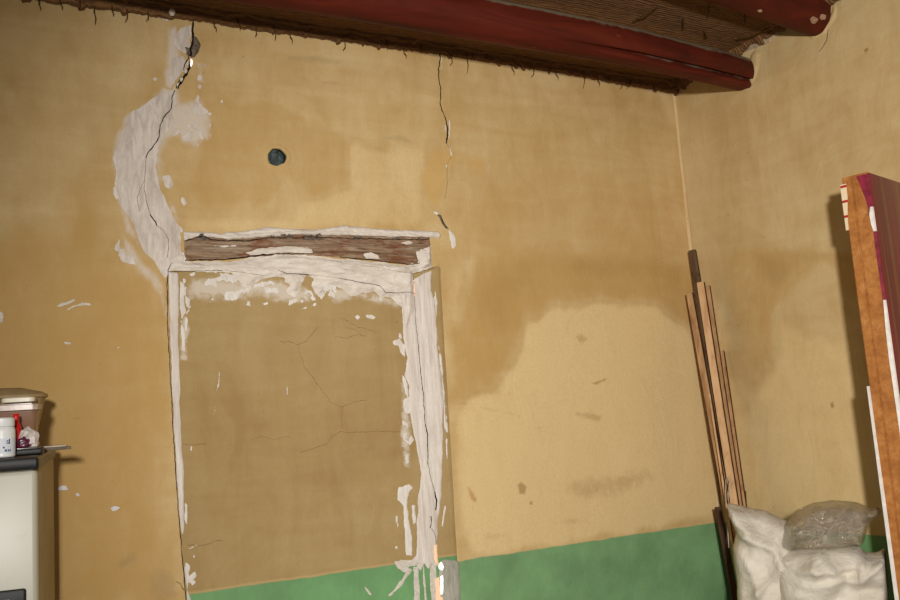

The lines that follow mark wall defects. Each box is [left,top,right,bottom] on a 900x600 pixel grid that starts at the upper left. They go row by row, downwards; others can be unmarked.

flaking render [184,546,196,600]
flaking render [109,18,448,570]
crack [137,21,437,600]
crack [438,54,452,198]